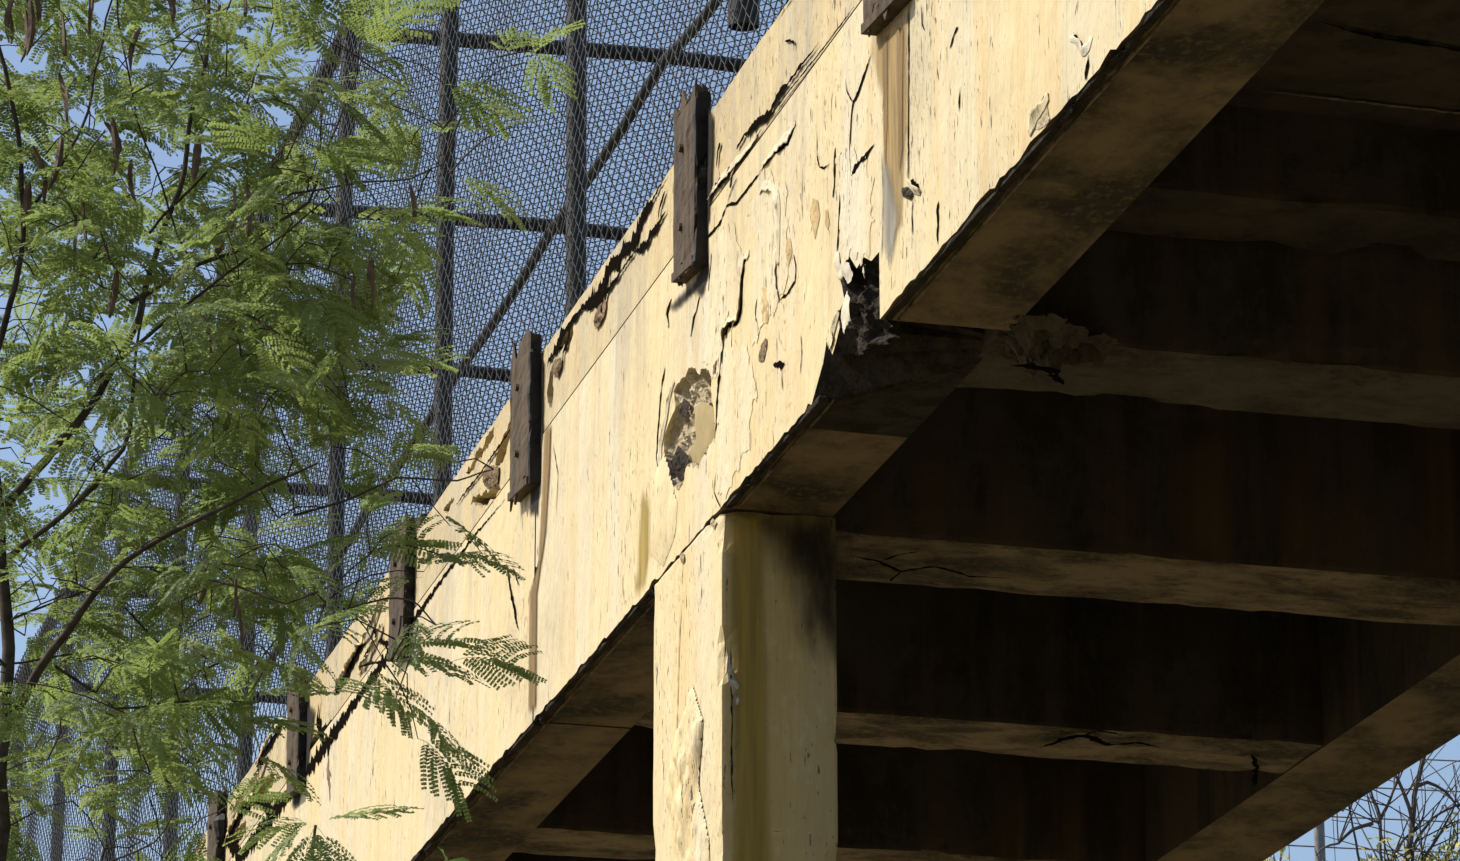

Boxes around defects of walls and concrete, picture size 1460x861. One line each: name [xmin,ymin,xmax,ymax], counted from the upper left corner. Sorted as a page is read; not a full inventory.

crack [545,176,666,376]
peeling [657,119,796,500]
crack [707,0,855,291]
peeling [811,144,906,356]
crack [802,17,958,249]
rust [871,23,905,225]
crack [224,429,510,861]
water stain [732,508,844,861]
crack [1039,730,1167,750]
crack [1251,754,1260,786]